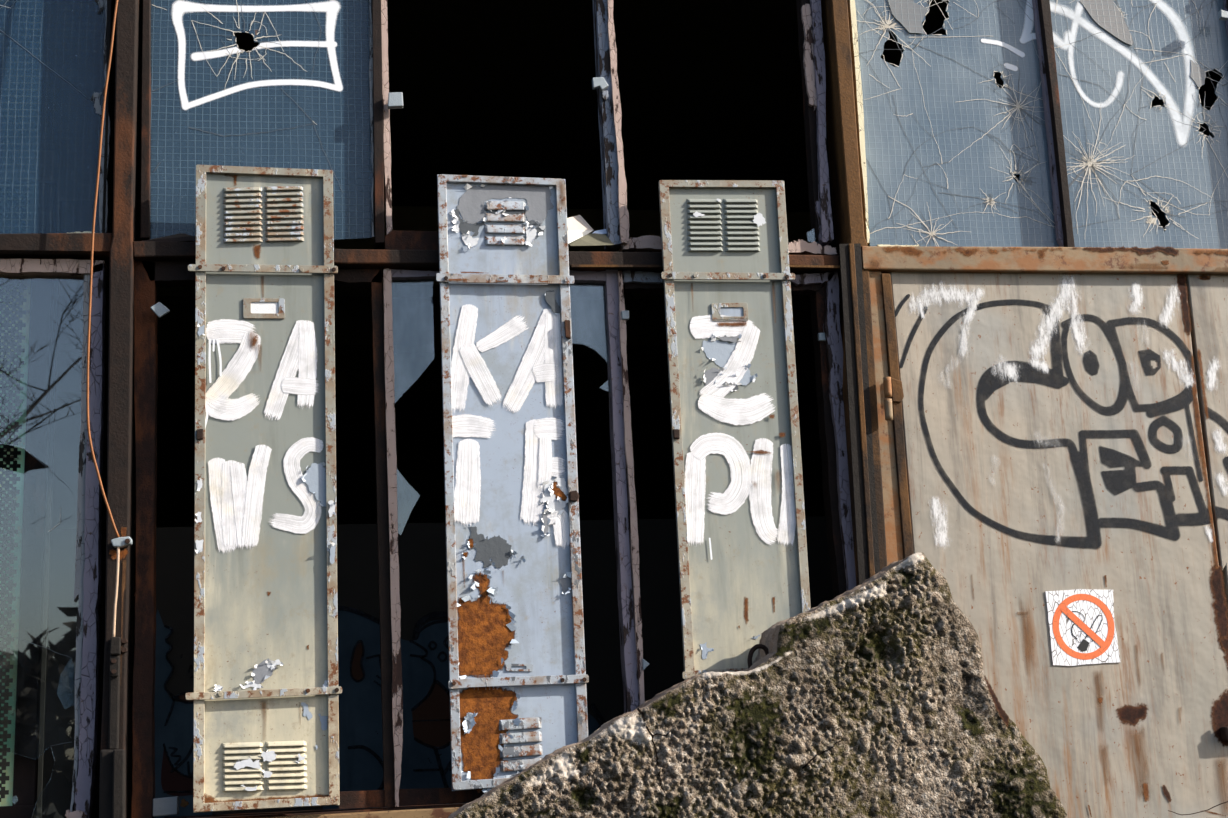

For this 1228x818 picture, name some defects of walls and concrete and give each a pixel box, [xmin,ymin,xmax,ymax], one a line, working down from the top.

corrosion [884,246,1228,335]
peeling [701,334,758,392]
corrosion [1191,349,1228,669]
peeling [462,525,526,570]
peeling [240,658,284,690]
corrosion [457,558,524,793]
corrosion [1211,689,1228,746]
corrosion [1116,703,1172,802]
corrosion [1205,761,1228,815]